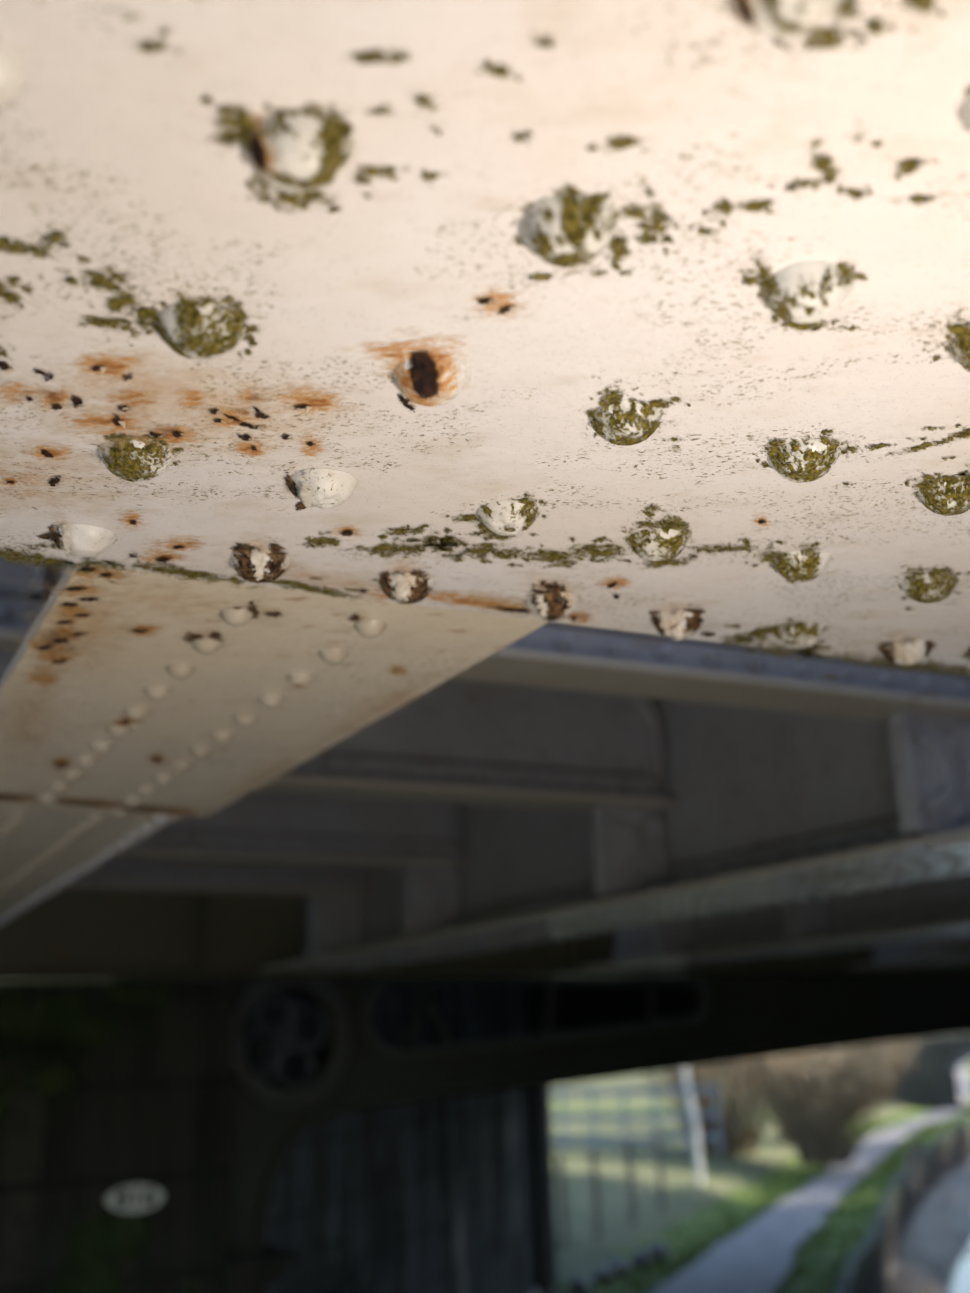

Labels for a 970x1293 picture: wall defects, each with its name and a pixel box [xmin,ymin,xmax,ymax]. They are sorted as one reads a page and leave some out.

rust [735,0,755,25]
rust [247,116,275,175]
rust [0,354,196,443]
rust [184,387,338,456]
rust [370,338,457,413]
rust [31,446,71,460]
rust [26,566,124,687]
rust [128,625,160,636]
rust [427,591,533,614]
rust [569,612,592,624]